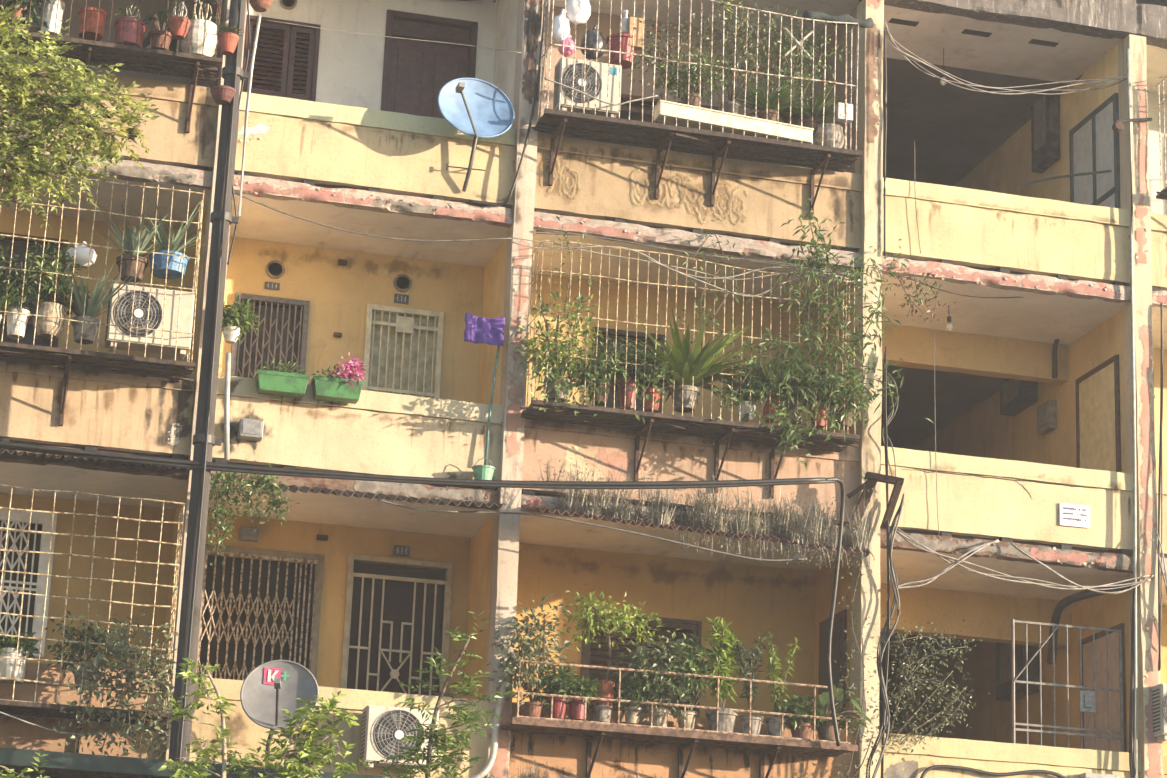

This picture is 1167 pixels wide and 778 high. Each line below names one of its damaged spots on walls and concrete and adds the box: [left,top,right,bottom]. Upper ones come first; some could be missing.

peeling [521,0,544,104]
water stain [185,114,205,154]
peeling [1129,82,1149,264]
peeling [235,177,506,222]
water stain [146,378,196,449]
peeling [597,446,631,481]
peeling [895,325,1157,583]
water stain [769,755,804,778]
peeling [884,761,918,778]